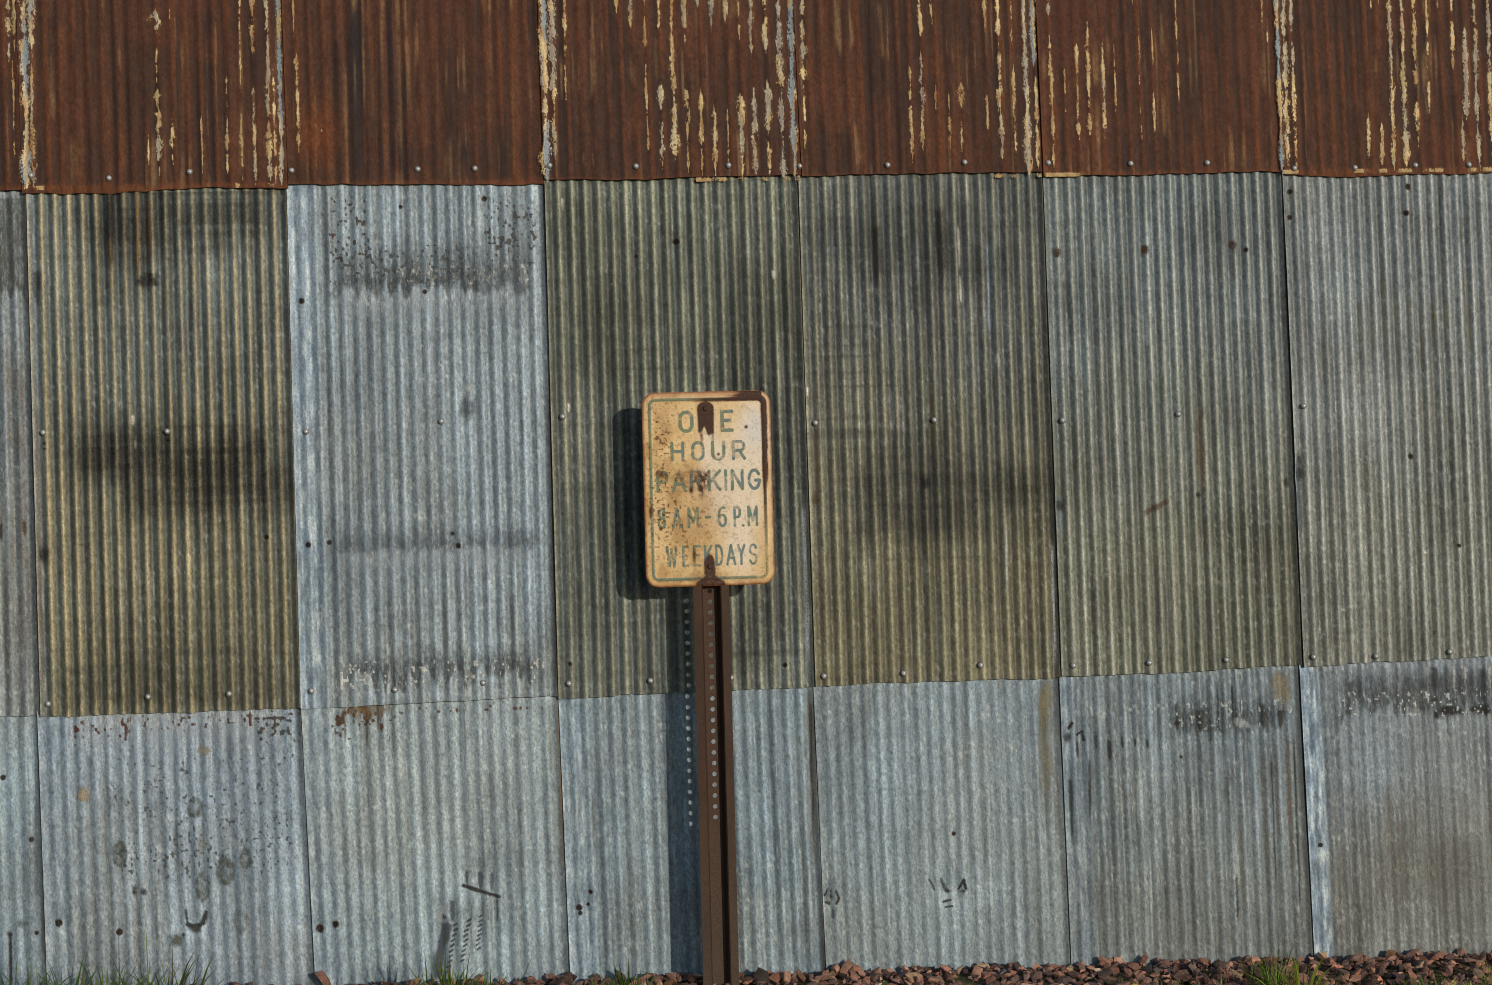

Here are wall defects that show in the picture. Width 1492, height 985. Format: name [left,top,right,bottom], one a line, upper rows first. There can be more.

peeling [537,0,567,182]
peeling [614,0,808,182]
corrosion [0,0,1492,268]
peeling [907,0,965,163]
peeling [982,0,1117,179]
leakage [0,199,25,298]
leakage [81,427,288,512]
corrosion [332,705,458,740]
leakage [332,654,549,693]
leakage [1168,674,1292,732]
leakage [1338,666,1492,720]